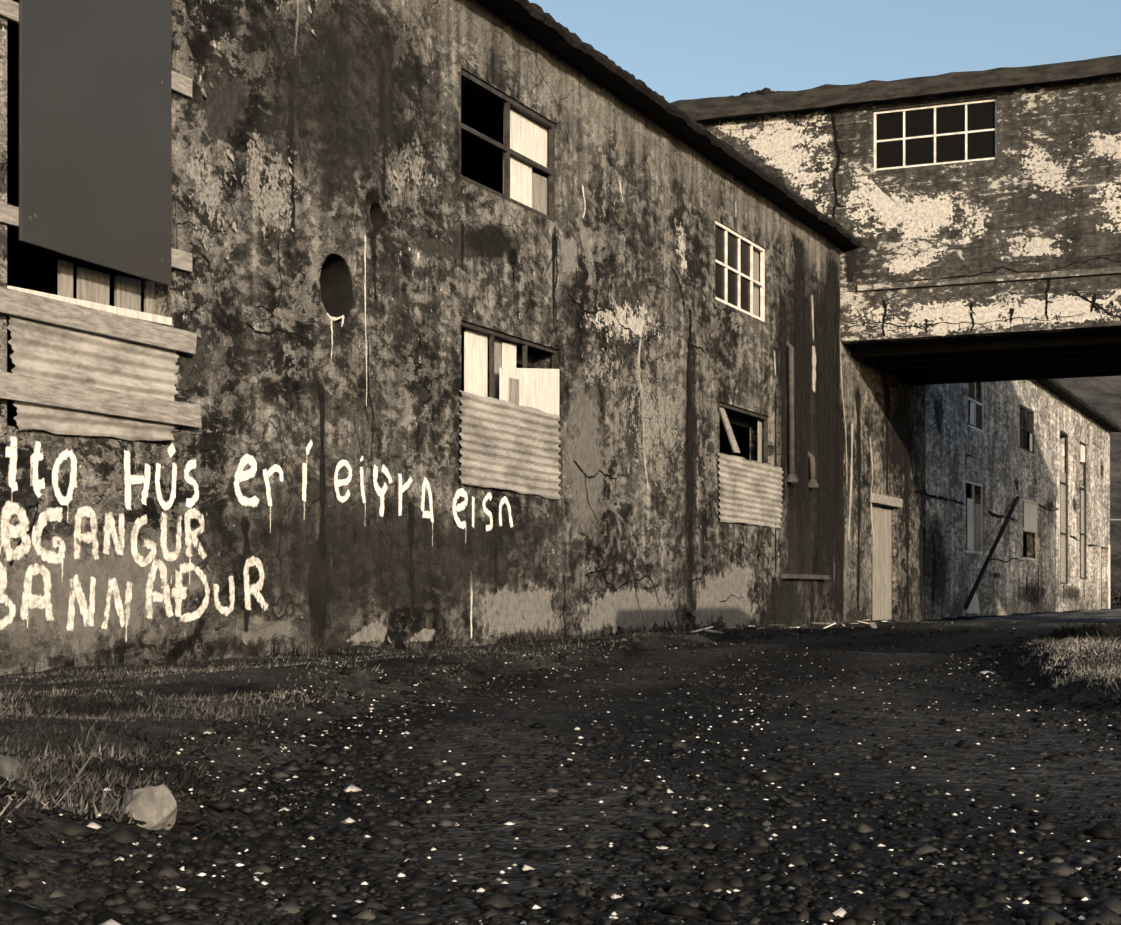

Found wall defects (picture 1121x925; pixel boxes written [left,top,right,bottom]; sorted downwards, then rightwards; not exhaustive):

leakage [260,0,413,238]
crack [830,107,851,219]
peeling [716,110,1121,275]
leakage [461,223,516,281]
leakage [327,313,345,359]
leakage [364,232,377,407]
peeling [843,289,1121,338]
crack [848,257,1121,337]
spalling [933,385,944,434]